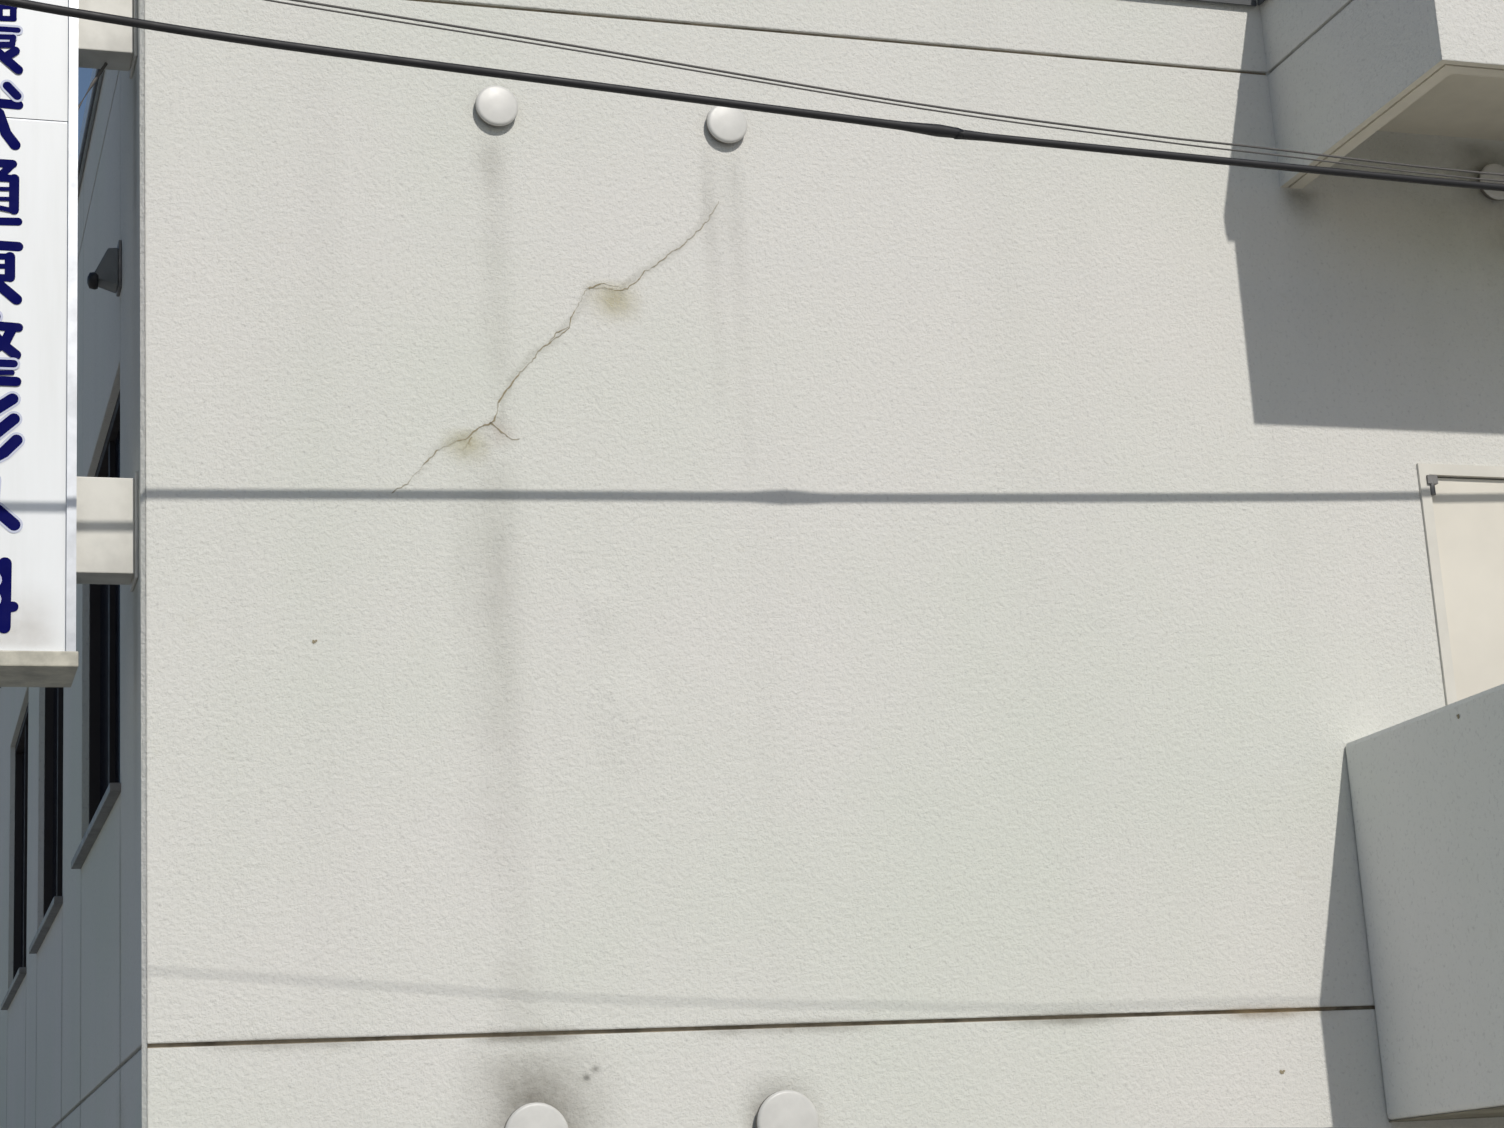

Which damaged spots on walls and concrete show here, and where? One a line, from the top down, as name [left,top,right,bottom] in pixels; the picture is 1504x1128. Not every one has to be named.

crack [392,202,719,493]